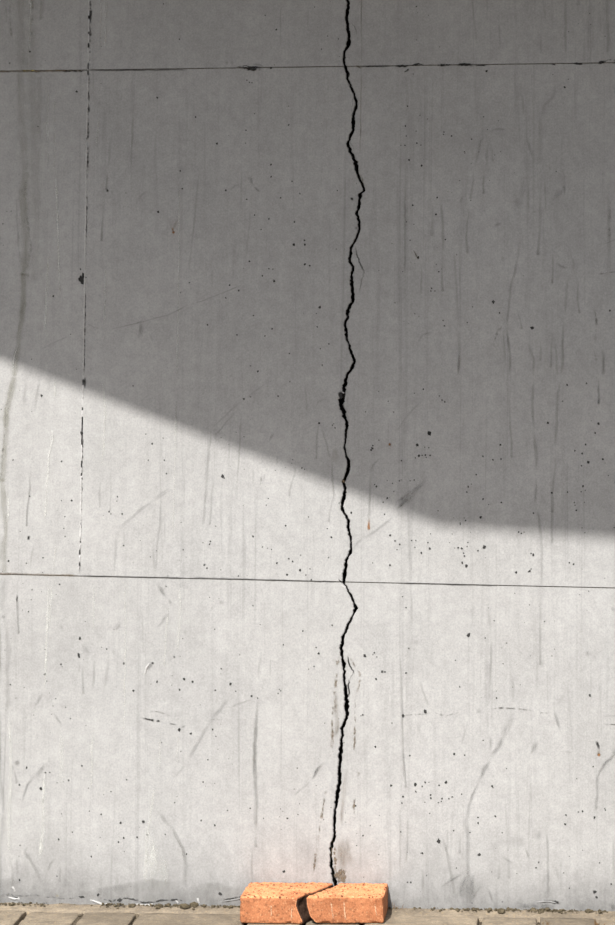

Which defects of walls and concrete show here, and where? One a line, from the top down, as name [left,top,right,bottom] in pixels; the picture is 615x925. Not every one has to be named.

crack [329,0,365,886]